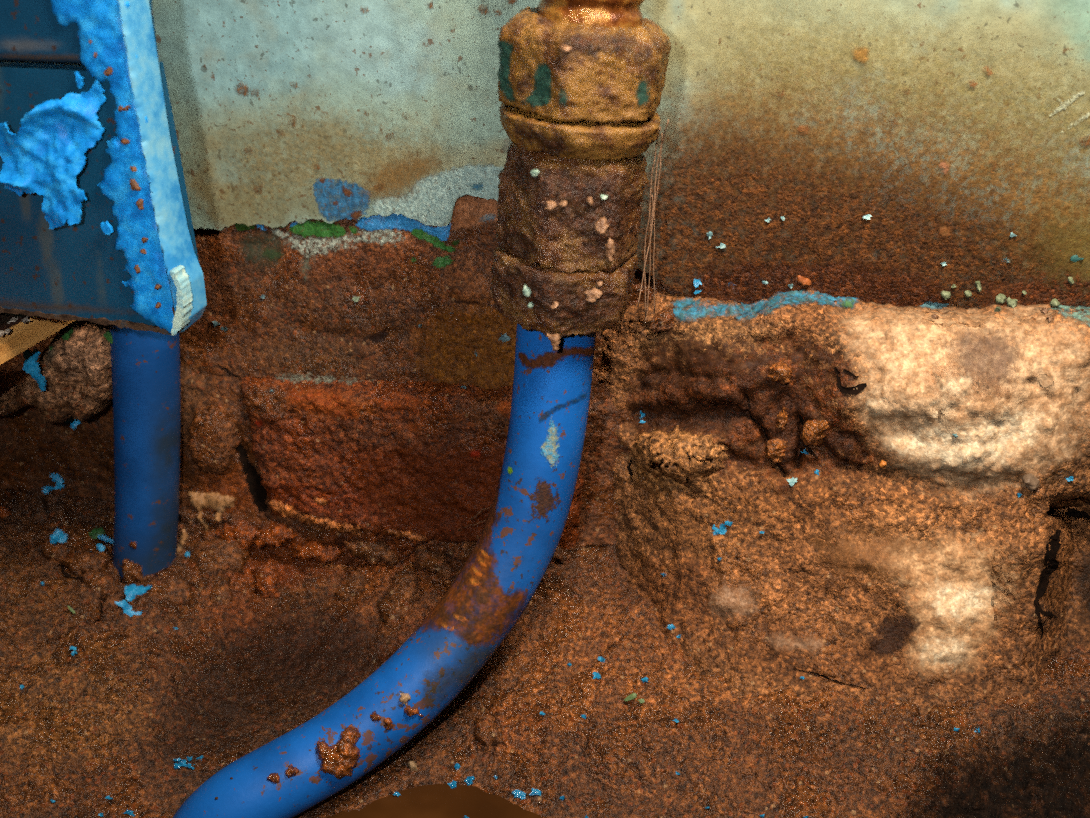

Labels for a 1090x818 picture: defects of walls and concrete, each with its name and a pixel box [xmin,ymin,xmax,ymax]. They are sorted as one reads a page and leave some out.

peeling [0,0,193,337]
damp [864,615,921,658]
crack [1034,508,1090,639]